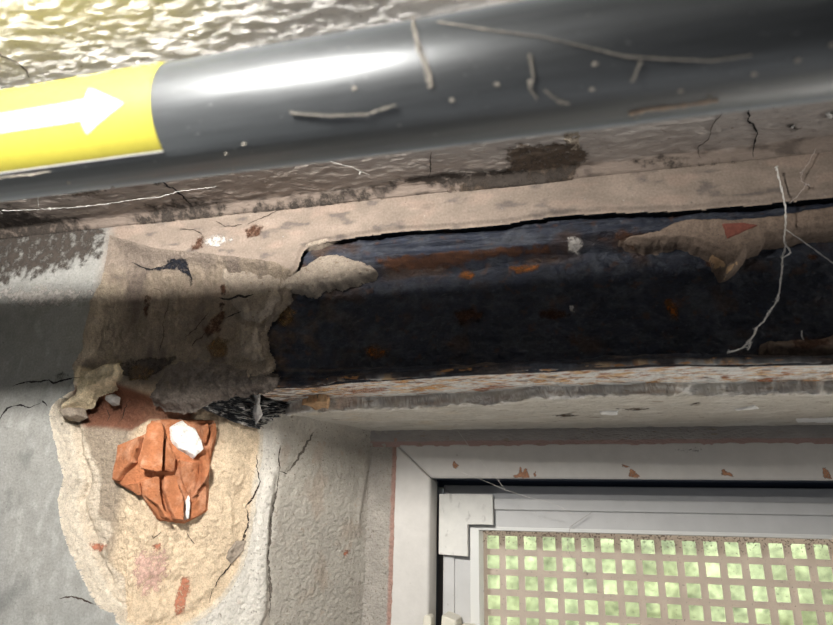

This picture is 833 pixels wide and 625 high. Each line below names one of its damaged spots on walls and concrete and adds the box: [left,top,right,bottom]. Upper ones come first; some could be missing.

crack [747,110,758,157]
leakage [377,142,588,193]
crack [155,182,190,204]
leakage [253,189,370,213]
leakage [0,204,105,306]
rust [378,245,550,279]
crack [0,373,80,419]
flaking render [49,235,295,625]
crack [267,432,314,617]